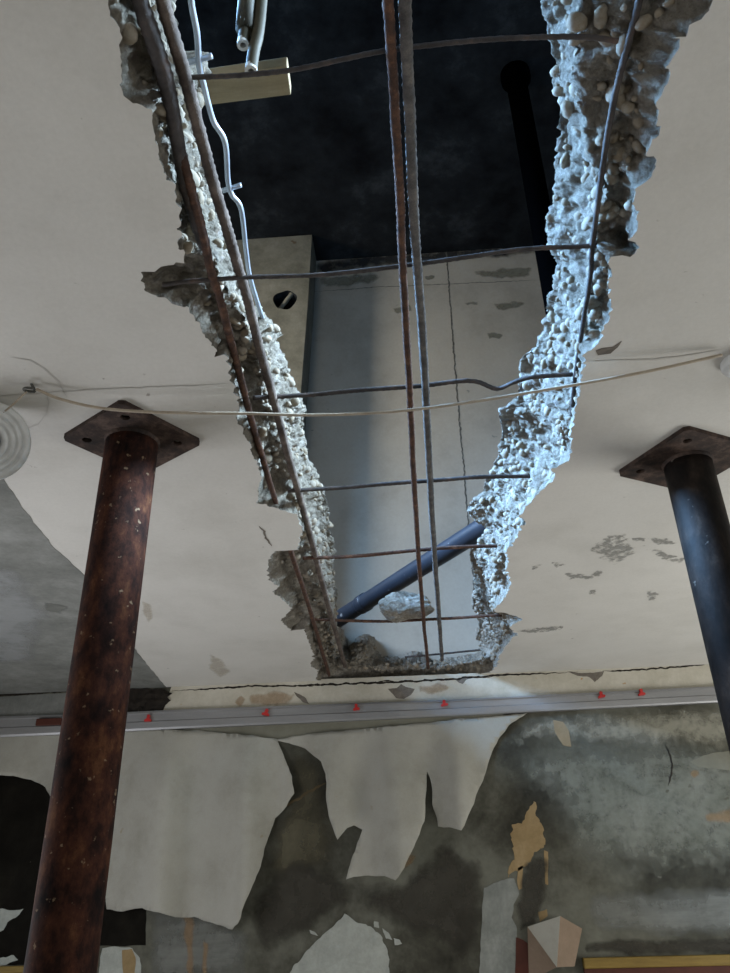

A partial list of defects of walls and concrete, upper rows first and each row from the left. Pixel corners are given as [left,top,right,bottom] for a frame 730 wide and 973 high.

spalling [108,0,713,699]
crack [175,672,567,691]
crack [611,664,701,672]
peeling [525,710,730,866]
peeling [0,775,50,966]
peeling [508,802,548,927]
peeling [100,899,146,946]
peeling [374,921,402,945]
peeling [515,938,529,973]
water stain [586,892,730,954]